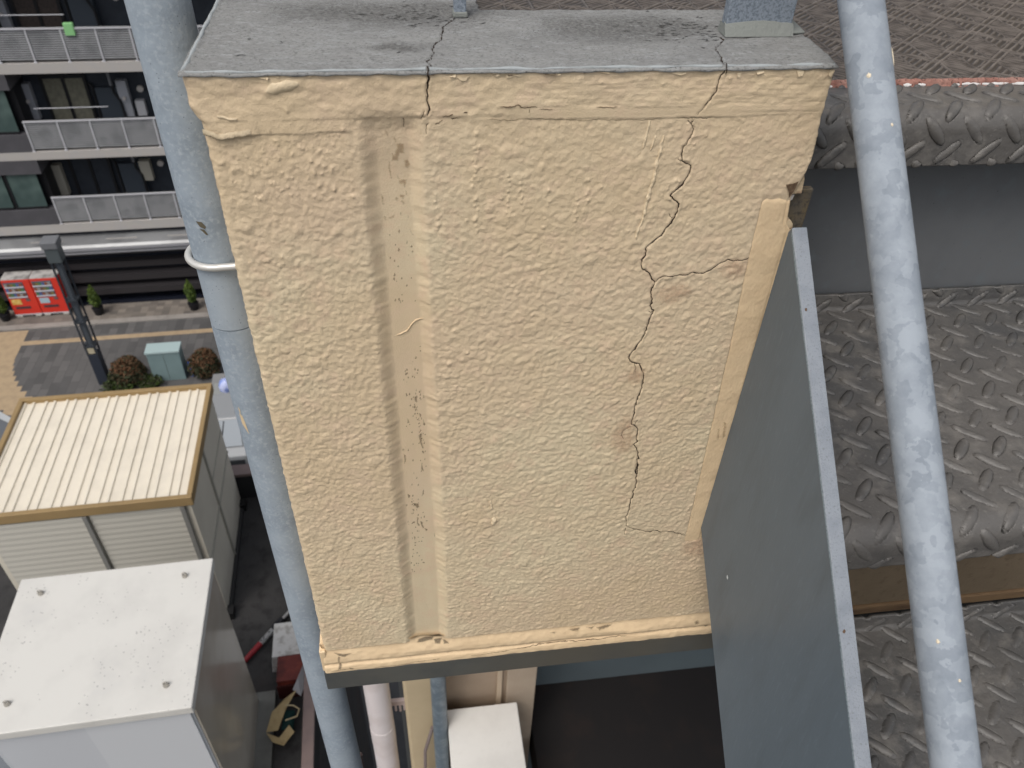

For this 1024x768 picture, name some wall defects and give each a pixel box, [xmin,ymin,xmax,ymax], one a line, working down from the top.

crack [403,19,751,535]